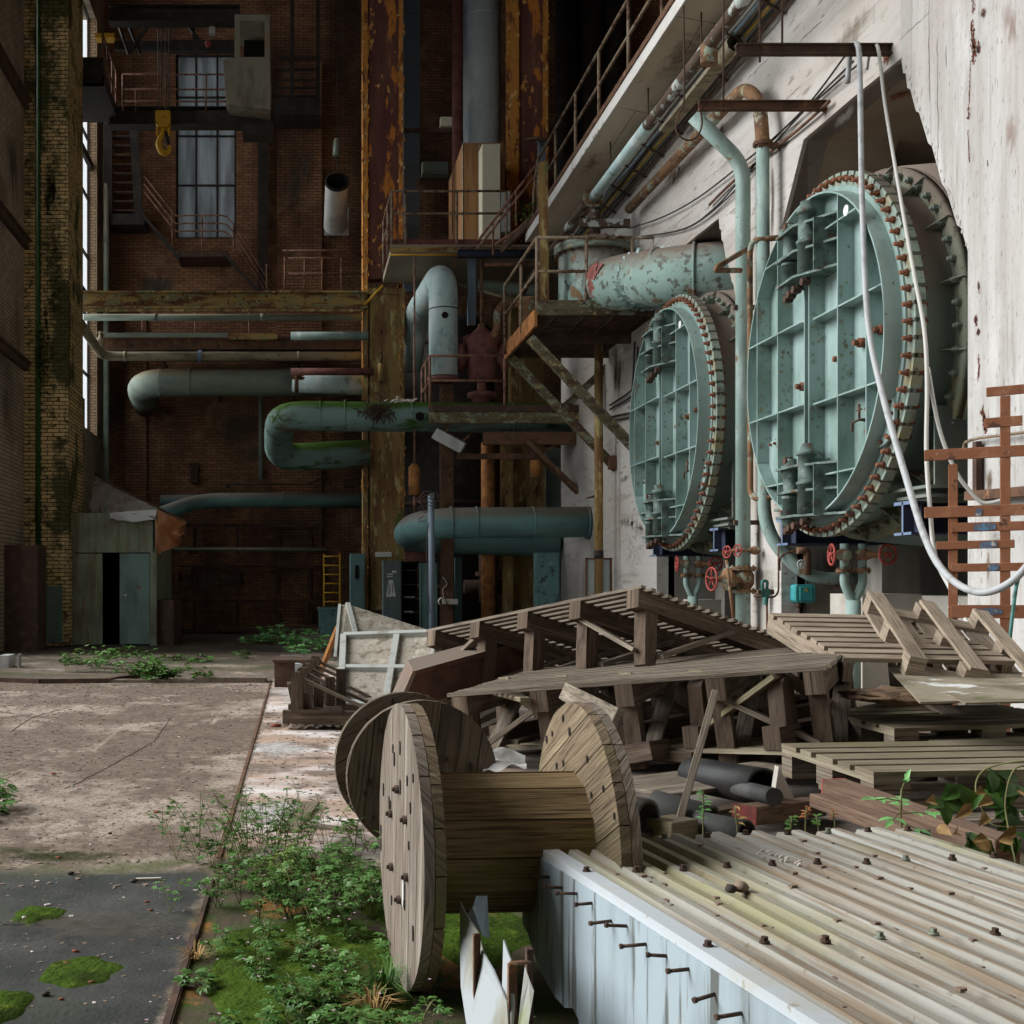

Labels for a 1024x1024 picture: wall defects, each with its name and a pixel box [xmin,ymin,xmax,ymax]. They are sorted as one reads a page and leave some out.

rust [361,0,370,279]
peeling [612,248,662,311]
crack [64,717,171,789]